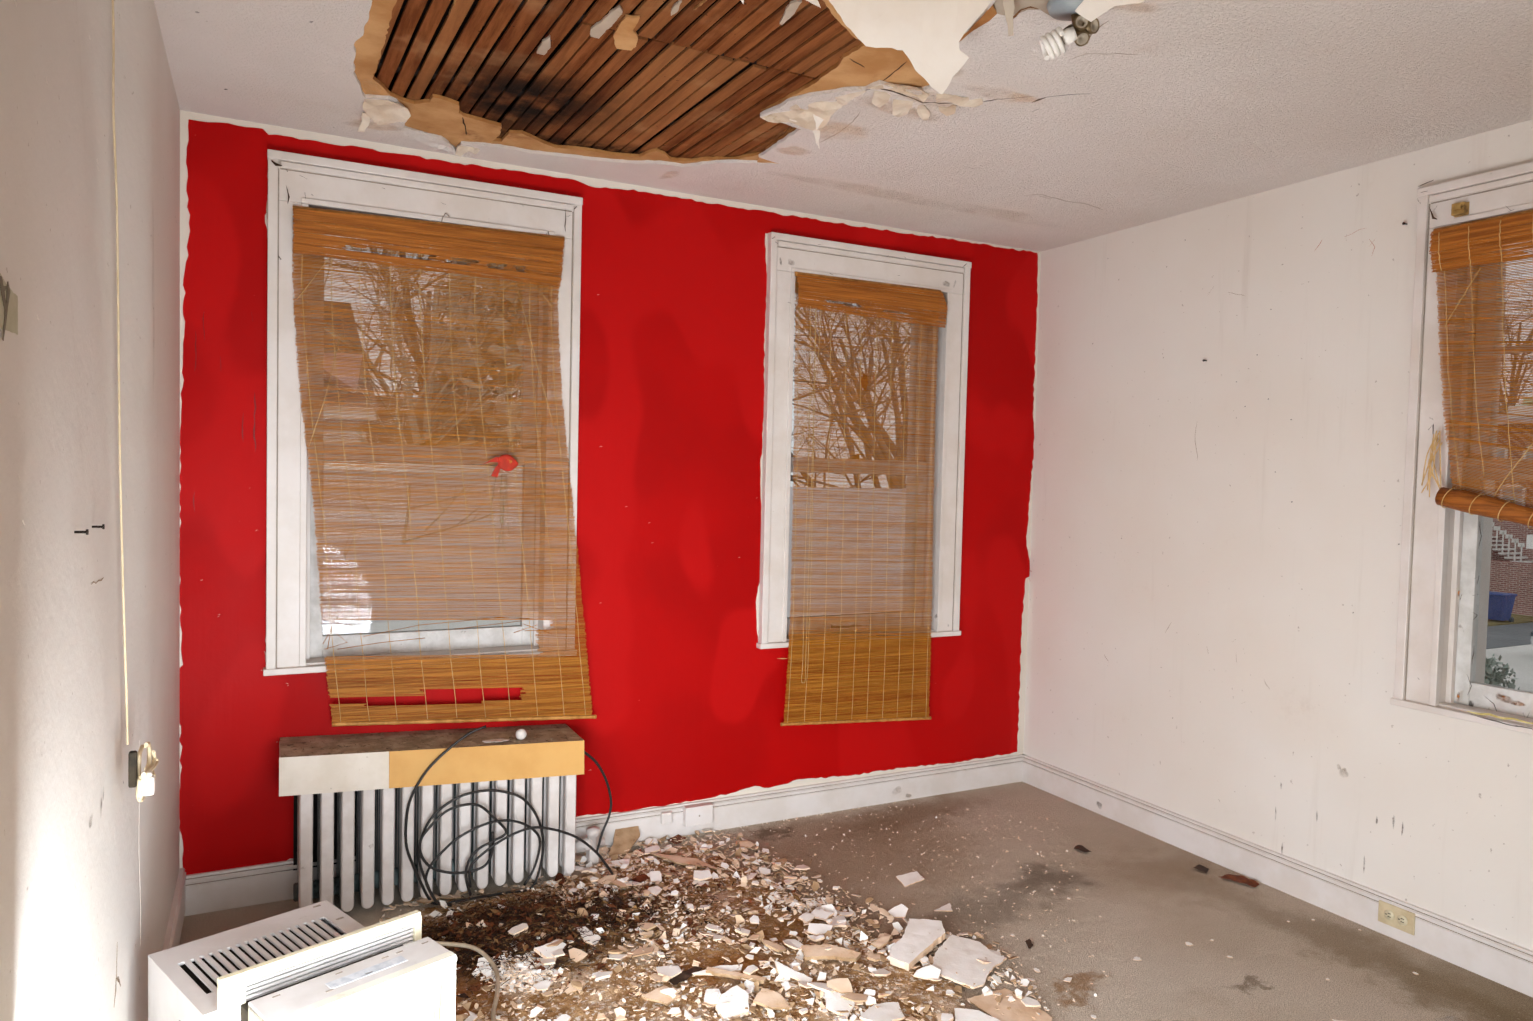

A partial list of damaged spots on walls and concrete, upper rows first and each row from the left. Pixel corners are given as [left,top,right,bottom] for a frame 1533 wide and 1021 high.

flaking render [1075,0,1144,22]
flaking render [760,0,1050,149]
flaking render [358,99,480,156]